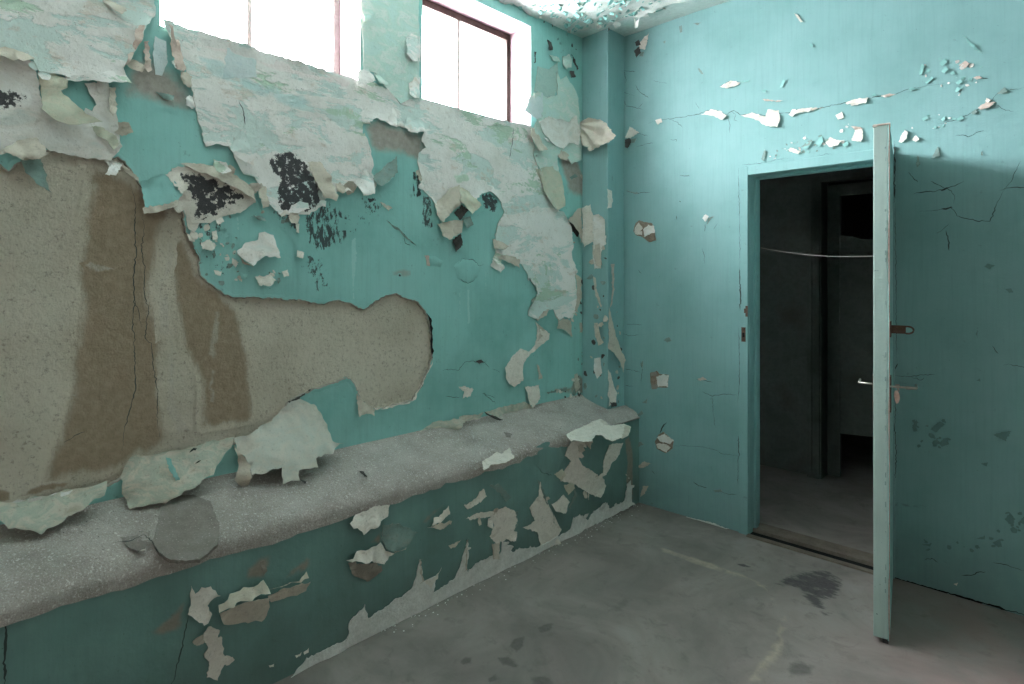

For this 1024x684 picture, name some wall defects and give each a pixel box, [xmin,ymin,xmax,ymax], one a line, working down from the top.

mould [0,84,33,120]
water stain [0,158,258,503]
crack [122,184,160,448]
flaking render [0,0,689,535]
water stain [263,118,434,299]
crack [624,70,931,146]
peeling [743,112,863,165]
crack [893,144,1024,484]
crack [922,87,1021,137]
peeling [346,499,452,582]
peeling [464,419,674,559]
water stain [658,546,850,684]